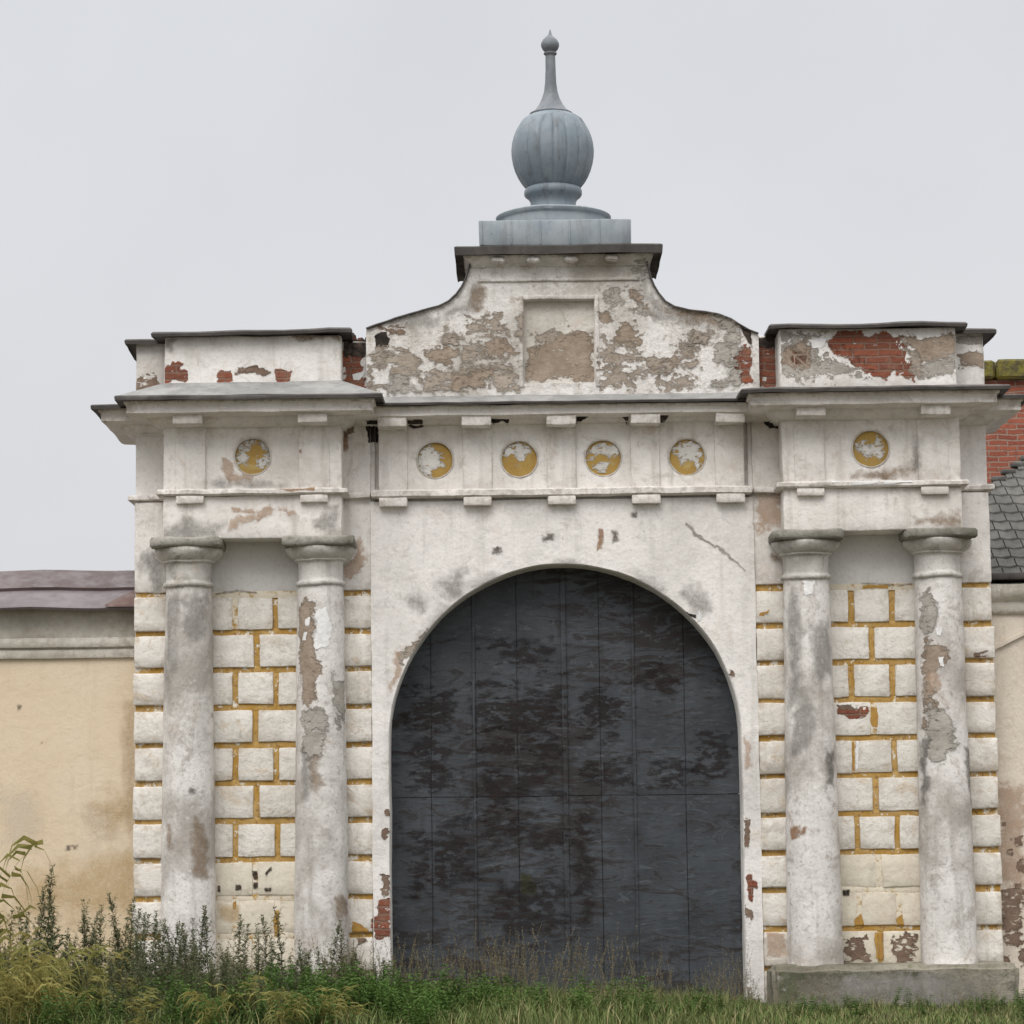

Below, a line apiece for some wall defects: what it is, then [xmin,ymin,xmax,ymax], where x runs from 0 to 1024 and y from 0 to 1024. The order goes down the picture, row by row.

flaking render [342,258,984,396]
flaking render [136,361,188,390]
flaking render [217,365,292,382]
crack [686,523,744,570]
flaking render [297,596,346,760]
flaking render [917,586,961,765]
flaking render [837,704,878,727]
peeling [852,741,860,771]
flaking render [352,873,391,945]
peeling [1001,835,1024,967]
peeling [843,914,919,963]